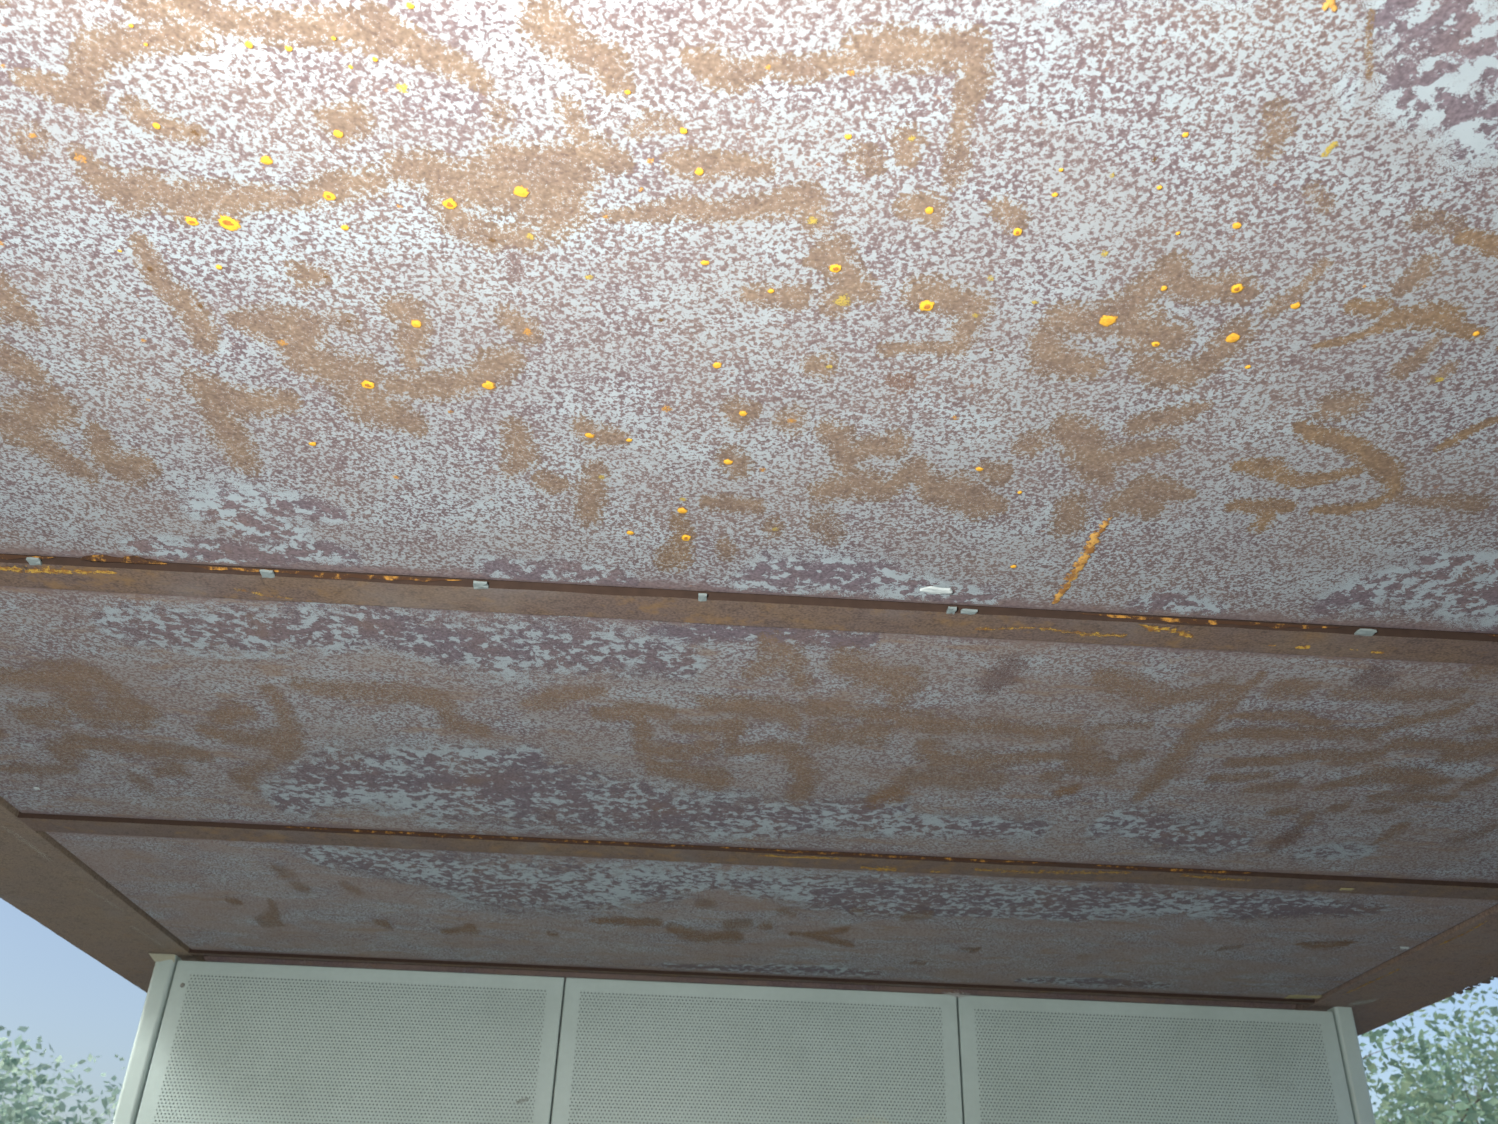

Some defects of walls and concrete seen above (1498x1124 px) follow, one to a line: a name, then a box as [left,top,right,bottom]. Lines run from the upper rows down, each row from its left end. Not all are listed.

rust [1322,0,1338,12]
rust [0,0,1001,490]
rust [651,231,1334,604]
rust [0,554,167,575]
rust [189,565,459,582]
rust [975,613,1340,649]
rust [289,676,491,739]
rust [516,628,822,810]
rust [0,731,216,797]
rust [911,735,1082,799]
rust [1086,649,1498,854]